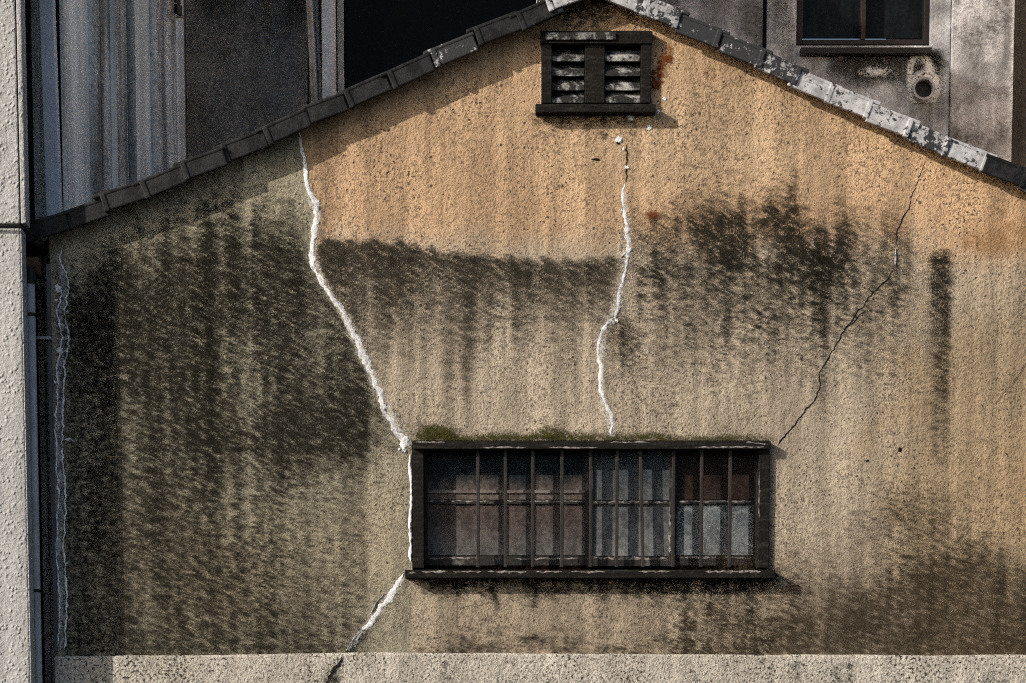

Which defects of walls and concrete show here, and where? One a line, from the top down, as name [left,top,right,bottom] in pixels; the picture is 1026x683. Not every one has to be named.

rust [651,45,672,90]
leakage [832,50,941,85]
crack [53,248,75,651]
crack [298,132,413,653]
leakage [60,170,911,683]
crack [597,150,632,434]
crack [778,161,926,444]
leakage [926,249,952,436]
leakage [415,545,1026,683]